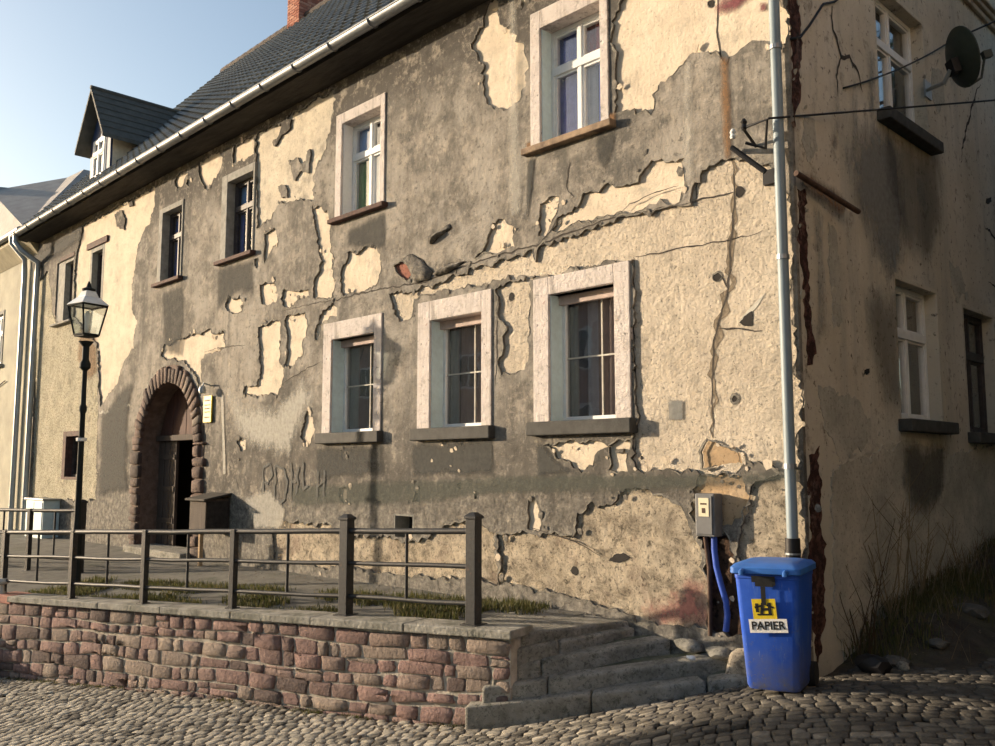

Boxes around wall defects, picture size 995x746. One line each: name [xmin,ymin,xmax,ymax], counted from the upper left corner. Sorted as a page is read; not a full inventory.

flaking render [468,0,528,111]
flaking render [609,0,818,162]
flaking render [31,186,155,502]
flaking render [160,328,226,388]
flaking render [173,87,827,663]
crack [284,159,763,438]